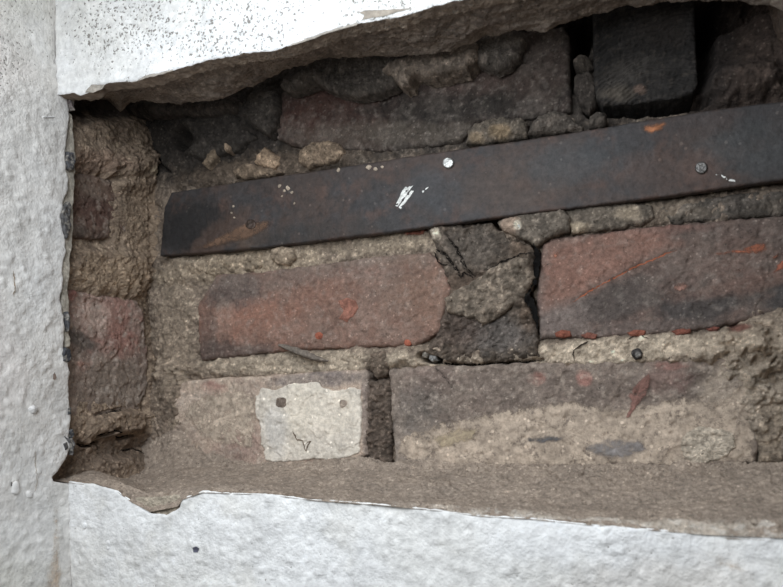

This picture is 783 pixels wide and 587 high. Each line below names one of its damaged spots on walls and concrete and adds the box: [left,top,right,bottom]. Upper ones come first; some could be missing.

spalling [290,8,410,46]
peeling [60,99,76,362]
corrosion [208,222,268,246]
spalling [555,330,597,339]
peeling [255,382,362,462]
peeling [63,429,75,455]
spalling [136,494,182,514]